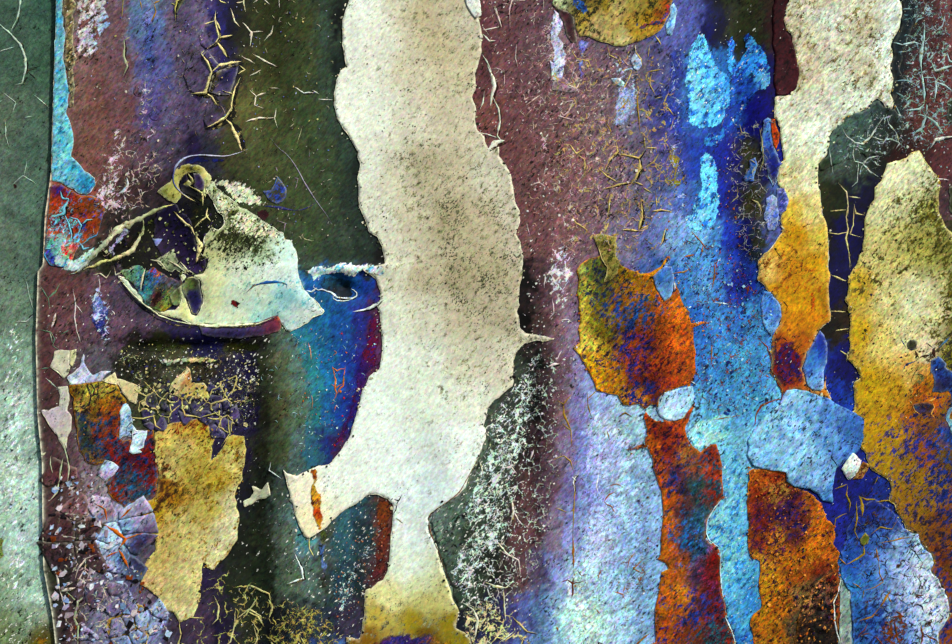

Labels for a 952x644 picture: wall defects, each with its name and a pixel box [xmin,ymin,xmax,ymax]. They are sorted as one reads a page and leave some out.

crack [295,73,331,107]
peeling [109,228,130,256]
peeling [152,203,206,314]
crack [46,0,320,292]
peeling [193,173,205,190]
peeling [263,177,287,204]
peeling [283,0,554,644]
peeling [593,234,620,283]
peeling [653,266,674,301]
peeling [657,0,952,644]
peeling [36,349,271,644]
crack [41,443,342,644]